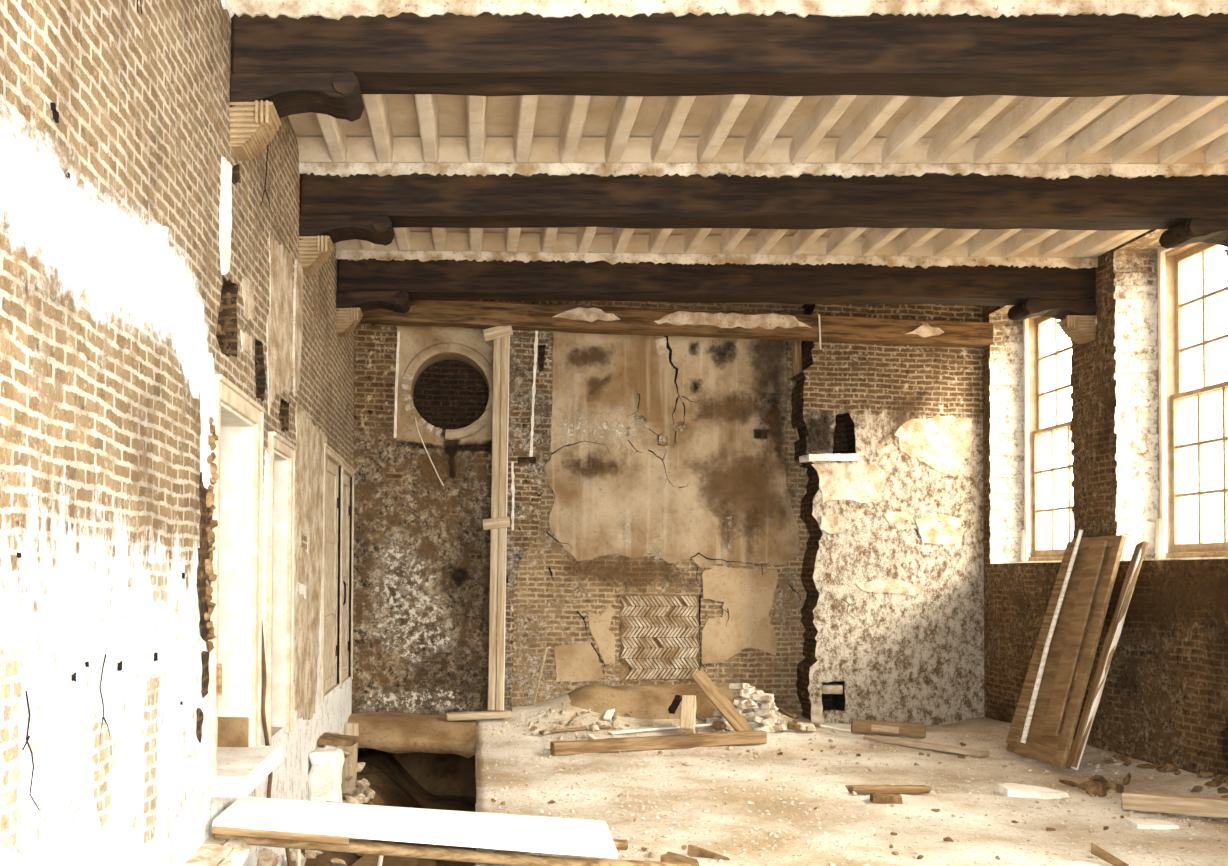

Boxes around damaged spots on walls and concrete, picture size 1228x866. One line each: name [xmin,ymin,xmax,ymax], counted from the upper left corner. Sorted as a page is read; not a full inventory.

crack [551,336,698,488]
water stain [698,395,764,423]
flaking render [517,331,800,665]
water stain [695,454,789,548]
flaking render [811,404,974,546]
flaking render [554,603,615,683]
crack [22,691,40,810]
crack [97,654,110,762]